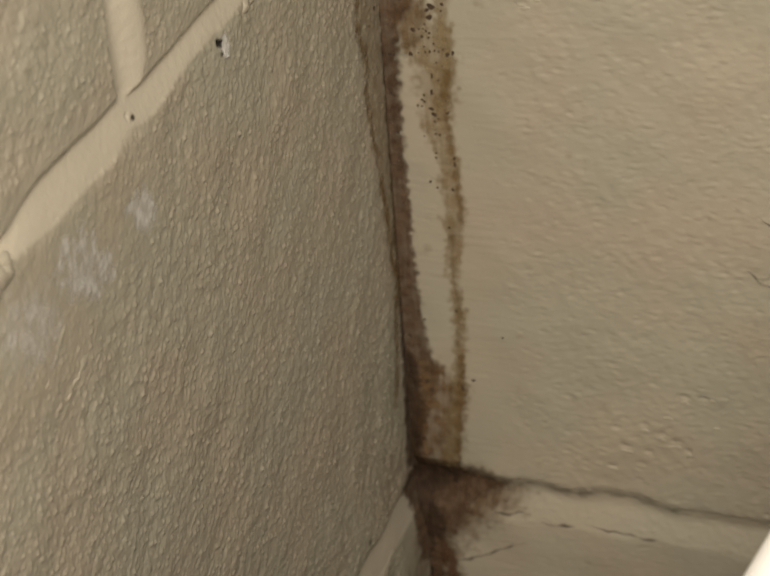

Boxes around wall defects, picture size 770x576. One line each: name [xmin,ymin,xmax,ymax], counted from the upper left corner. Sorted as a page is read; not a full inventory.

water stain [396,0,461,231]
water stain [412,346,476,471]